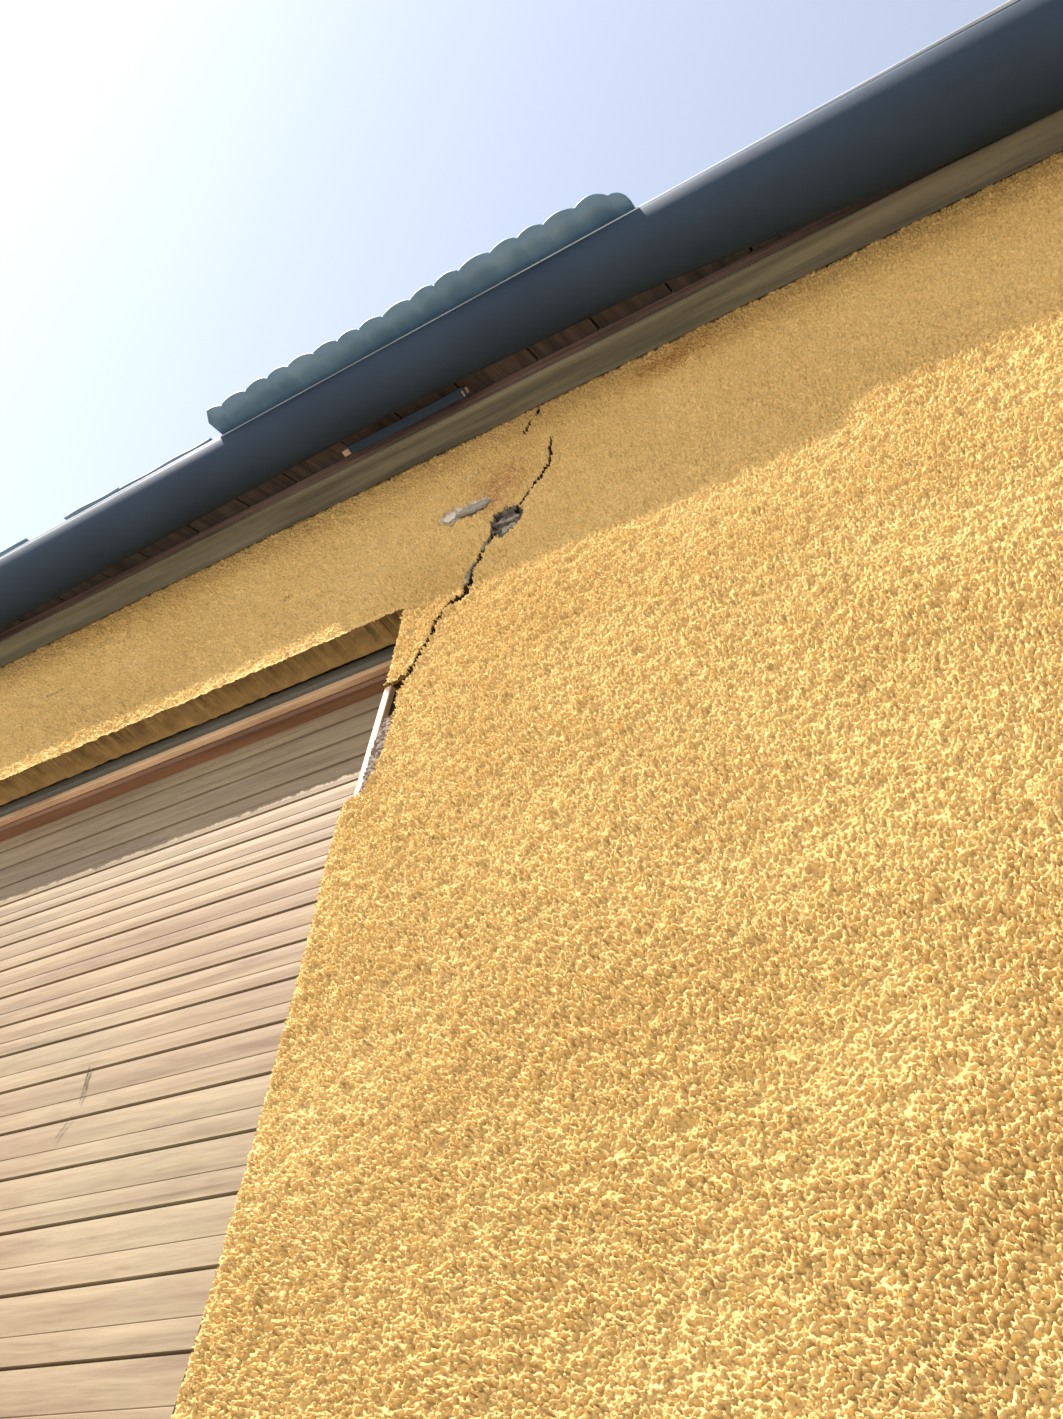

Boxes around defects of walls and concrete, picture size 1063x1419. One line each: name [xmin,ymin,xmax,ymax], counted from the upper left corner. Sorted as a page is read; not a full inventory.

crack [407,408,554,674]